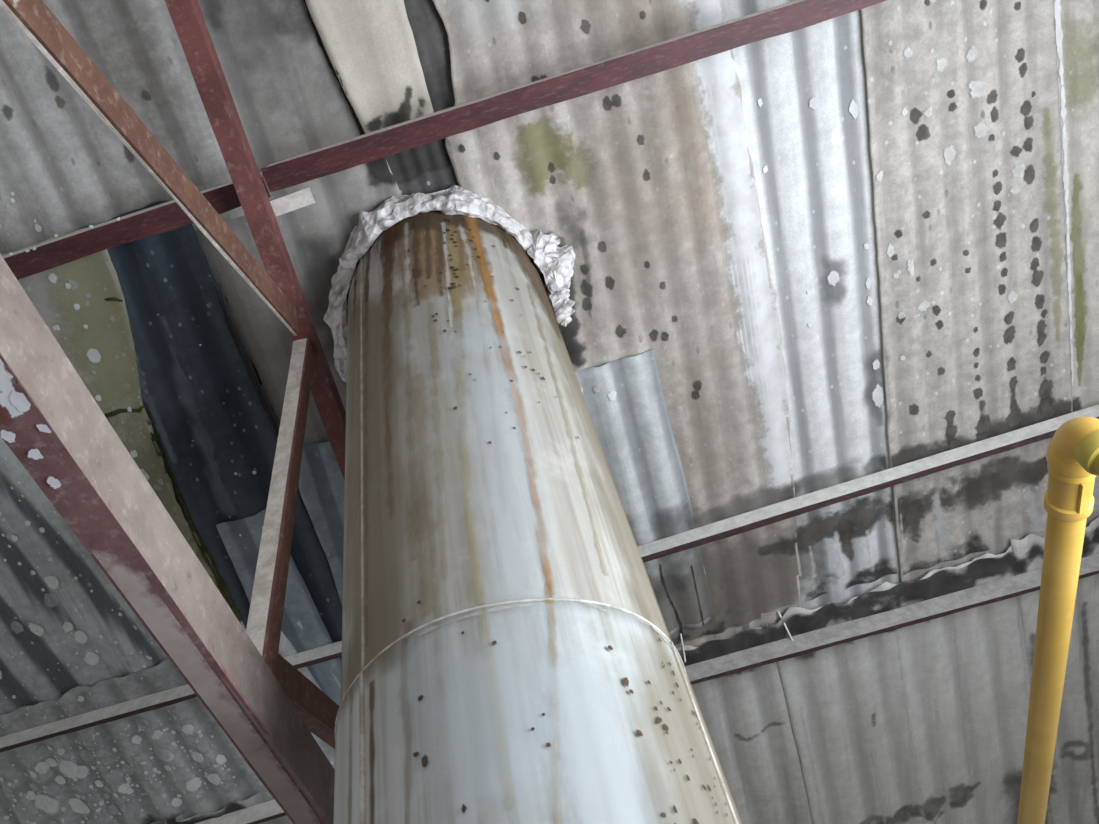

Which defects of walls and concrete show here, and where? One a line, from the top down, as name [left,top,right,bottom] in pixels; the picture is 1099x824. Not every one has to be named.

leakage [1016,48,1027,78]
leakage [367,87,425,132]
leakage [911,108,930,141]
leakage [988,90,999,141]
leakage [1011,91,1036,157]
leakage [366,138,466,185]
leakage [1054,0,1074,386]
leakage [993,170,1008,295]
leakage [881,218,1081,467]
rust [353,210,561,824]
leakage [651,457,1049,666]
leakage [1081,527,1099,558]